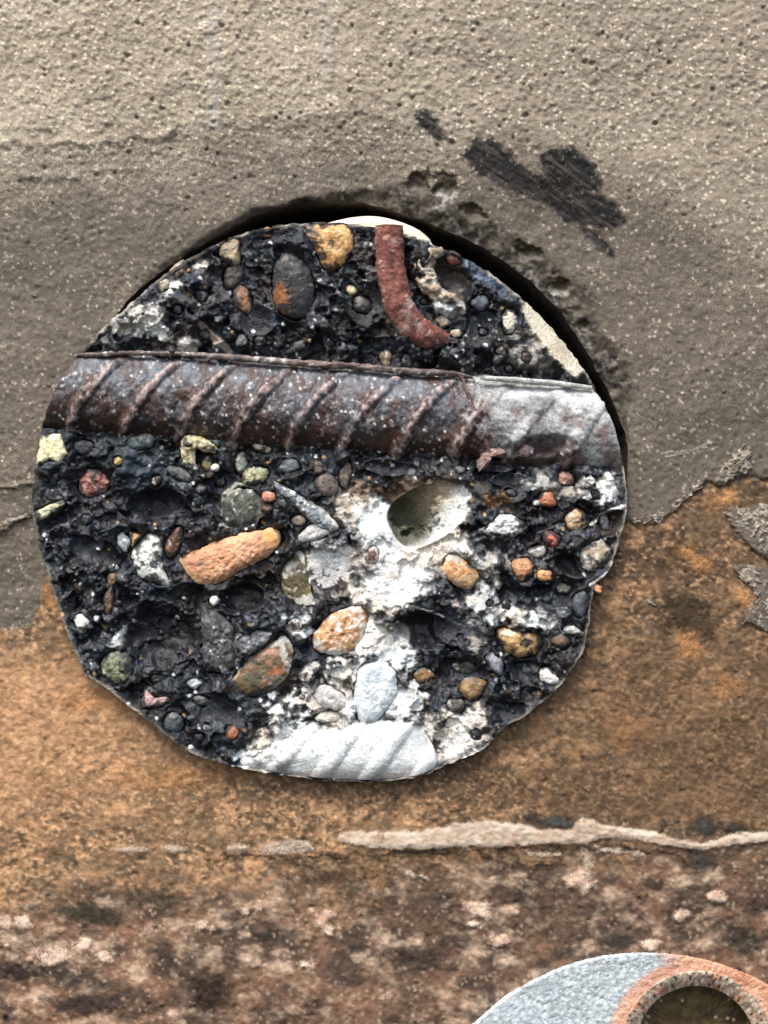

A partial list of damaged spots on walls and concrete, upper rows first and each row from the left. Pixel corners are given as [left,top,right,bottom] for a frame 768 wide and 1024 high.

water stain [0,83,768,630]
spalling [282,167,633,435]
corrosion [476,439,535,472]
peeling [630,443,753,525]
water stain [652,594,715,638]
peeling [723,503,768,627]
corrosion [0,477,768,1024]